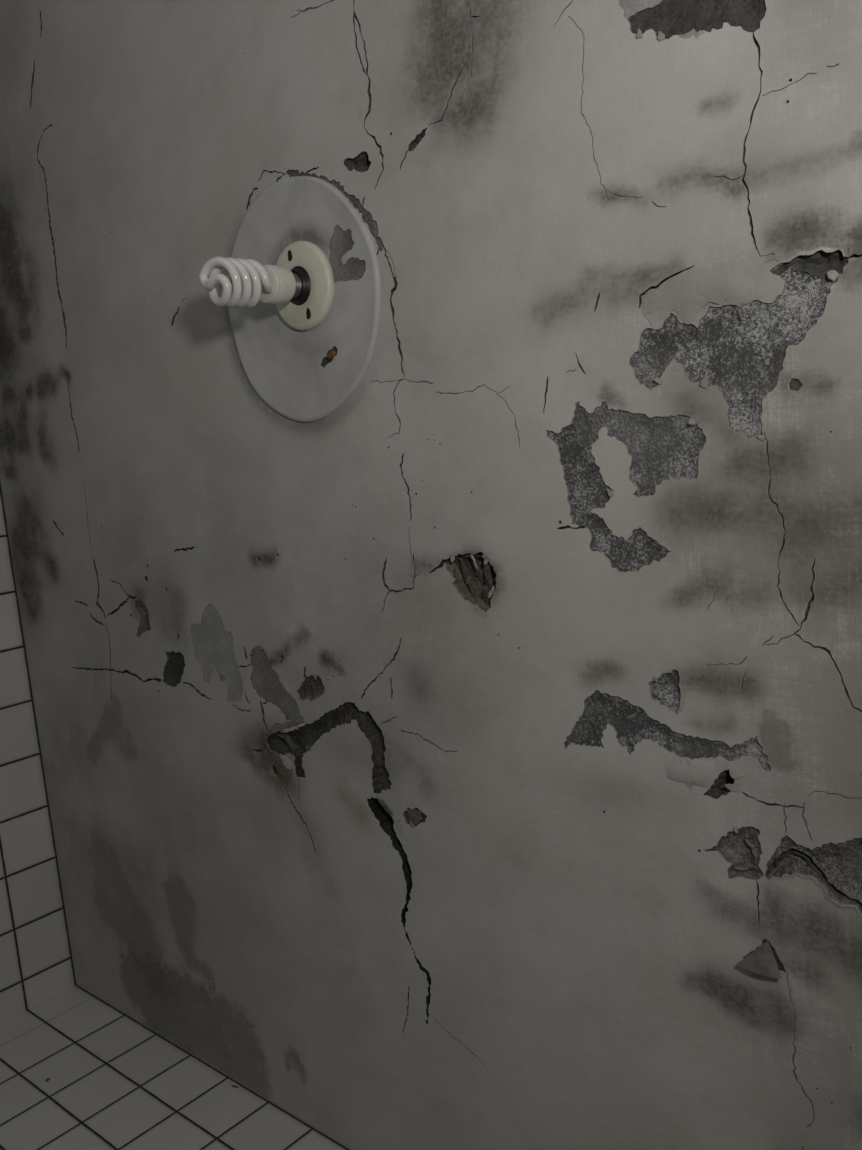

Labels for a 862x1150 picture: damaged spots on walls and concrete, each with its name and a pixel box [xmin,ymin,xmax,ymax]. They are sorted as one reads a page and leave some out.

flaking render [619,0,766,42]
crack [714,33,839,257]
damp [0,202,71,477]
rust [321,346,338,368]
crack [639,265,695,308]
flaking render [629,255,848,441]
crack [30,0,520,1067]
flaking render [546,401,706,573]
crack [706,432,862,712]
flaking render [564,690,771,799]
flaking render [698,826,862,919]
crack [732,775,862,926]